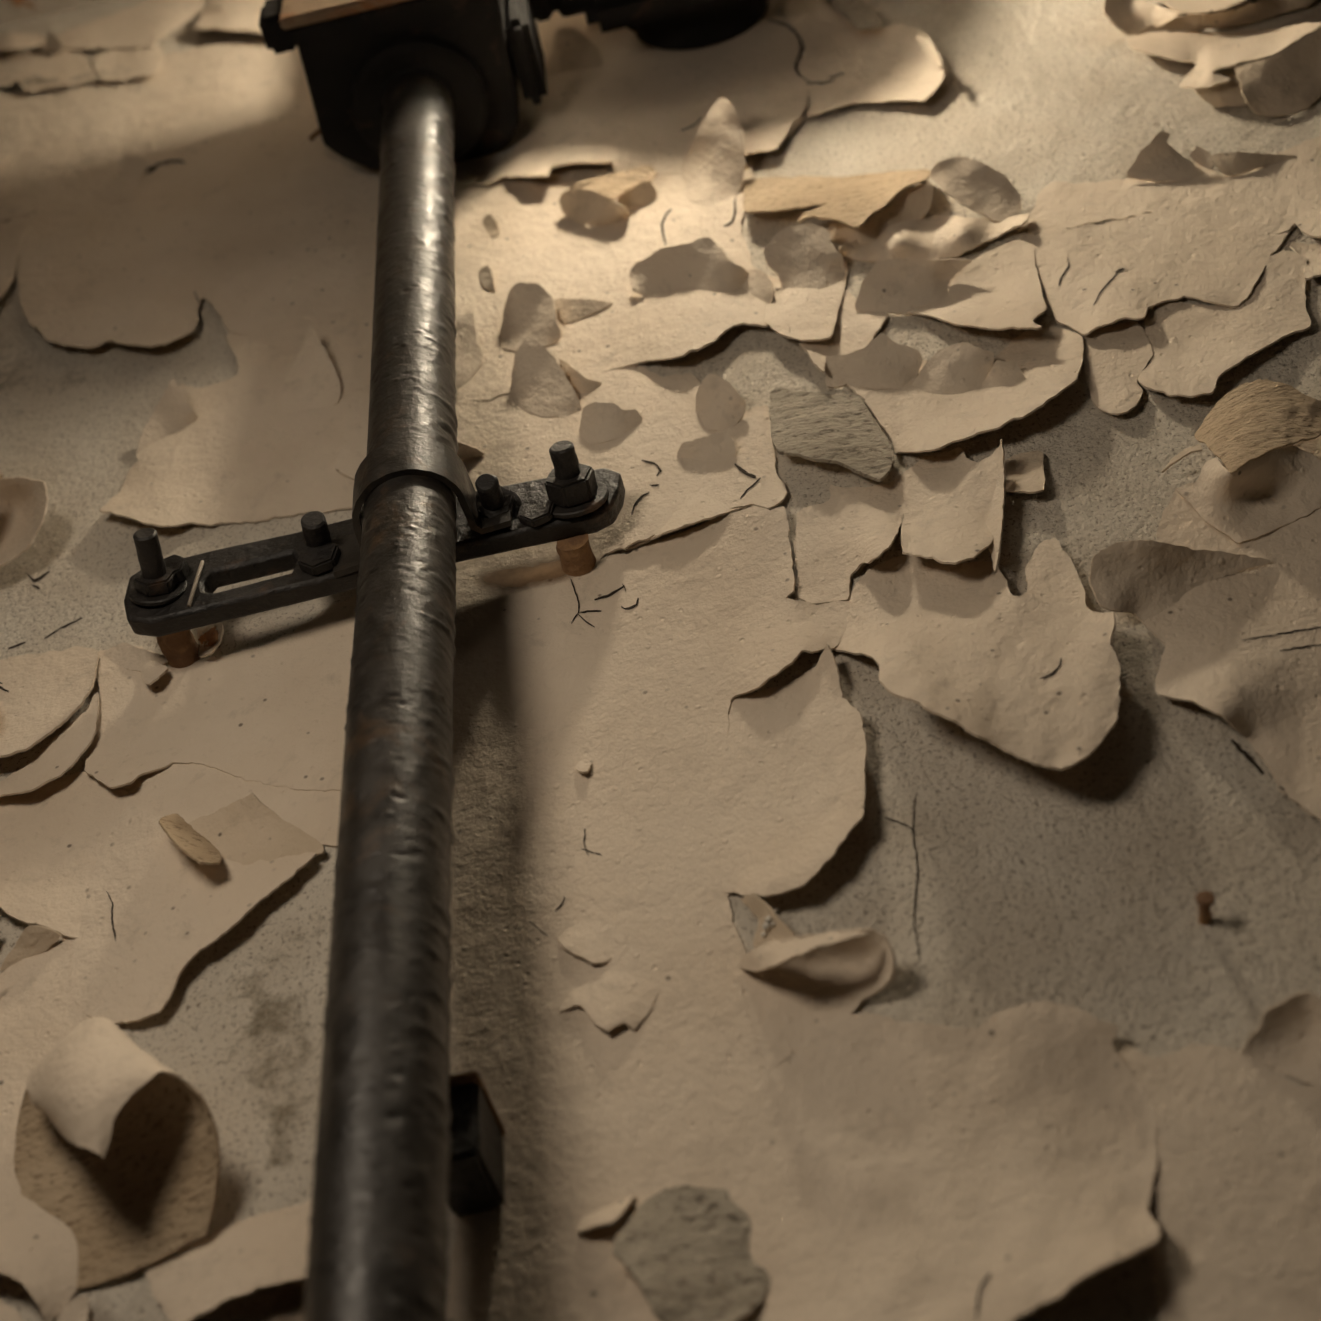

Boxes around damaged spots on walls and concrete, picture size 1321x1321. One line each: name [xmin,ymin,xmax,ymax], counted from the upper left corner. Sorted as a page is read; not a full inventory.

peeling [0,471,49,567]
peeling [0,594,357,1321]
peeling [0,0,379,527]
peeling [447,0,1321,1321]